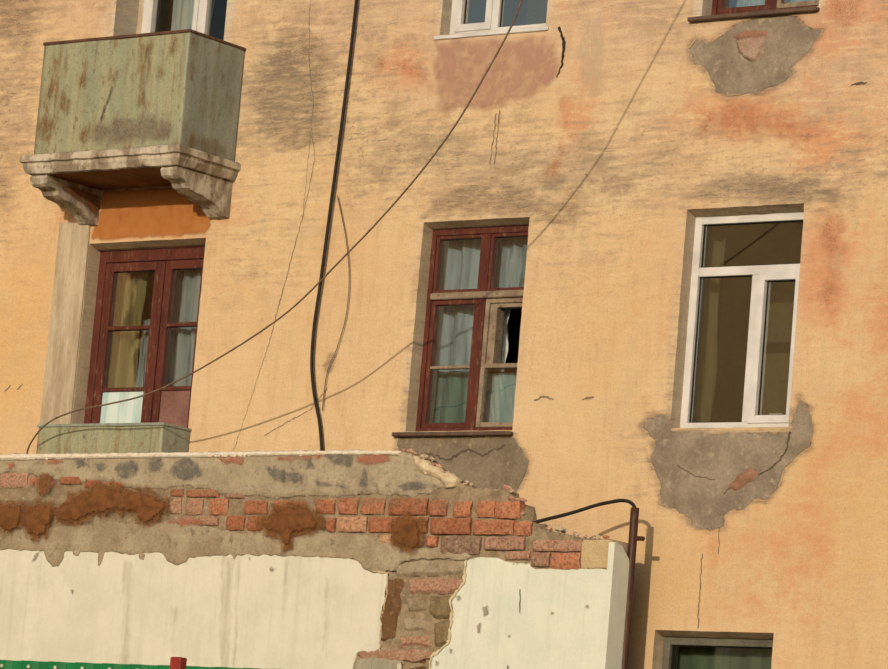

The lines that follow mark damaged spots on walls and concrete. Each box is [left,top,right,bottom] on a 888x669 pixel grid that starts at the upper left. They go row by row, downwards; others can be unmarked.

crack [556,26,566,78]
spalling [688,14,823,96]
spalling [397,436,529,493]
spalling [644,398,813,531]
peeling [0,521,472,669]
crack [697,528,720,628]